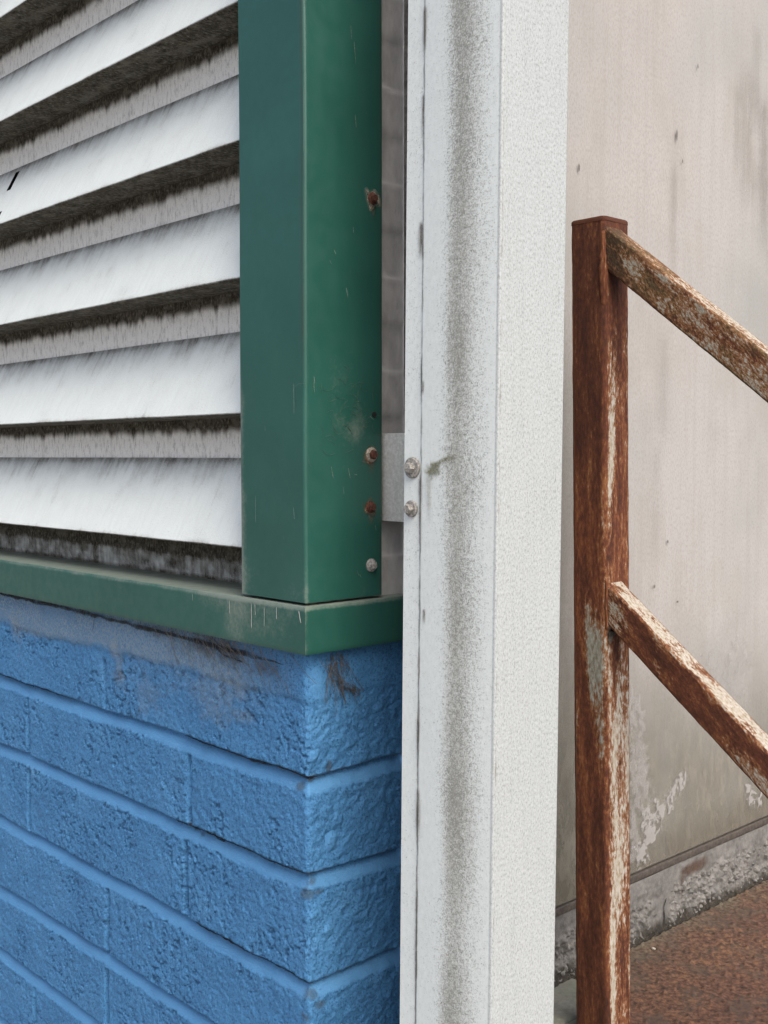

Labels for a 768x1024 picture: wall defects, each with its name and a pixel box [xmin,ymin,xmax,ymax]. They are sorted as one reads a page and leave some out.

leakage [0,592,240,686]
leakage [555,752,576,907]
peeling [633,771,686,863]
corrosion [682,859,704,882]
leakage [629,729,768,874]
peeling [745,784,762,806]